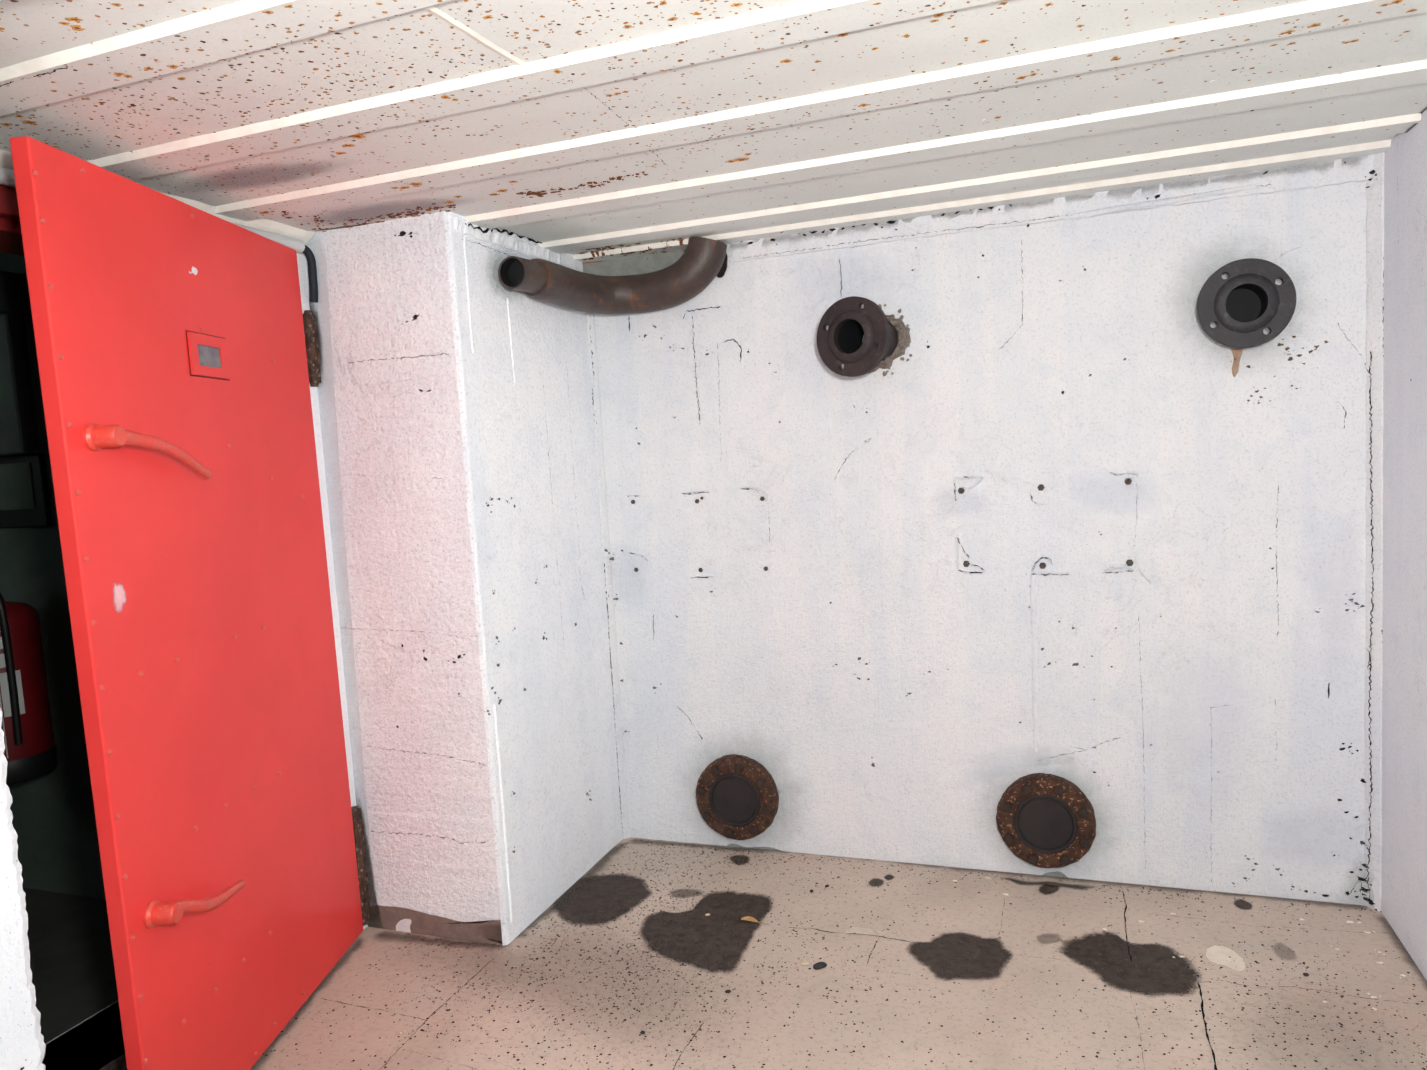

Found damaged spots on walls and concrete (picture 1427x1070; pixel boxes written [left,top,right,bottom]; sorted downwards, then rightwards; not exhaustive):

rust [846,1,1107,164]
rust [1095,0,1417,98]
rust [0,0,878,264]
rust [1230,347,1242,377]
leakage [553,874,772,972]
leakage [909,933,1012,980]
leakage [1061,931,1199,996]